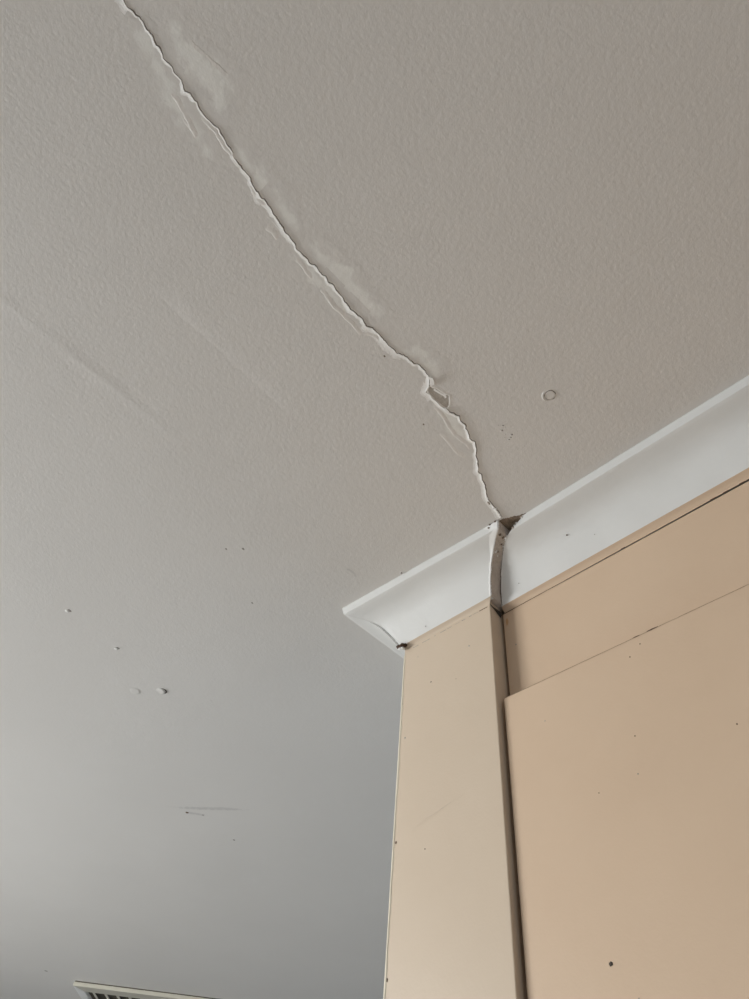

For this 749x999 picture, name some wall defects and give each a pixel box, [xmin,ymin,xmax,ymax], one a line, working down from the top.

crack [114,0,749,651]